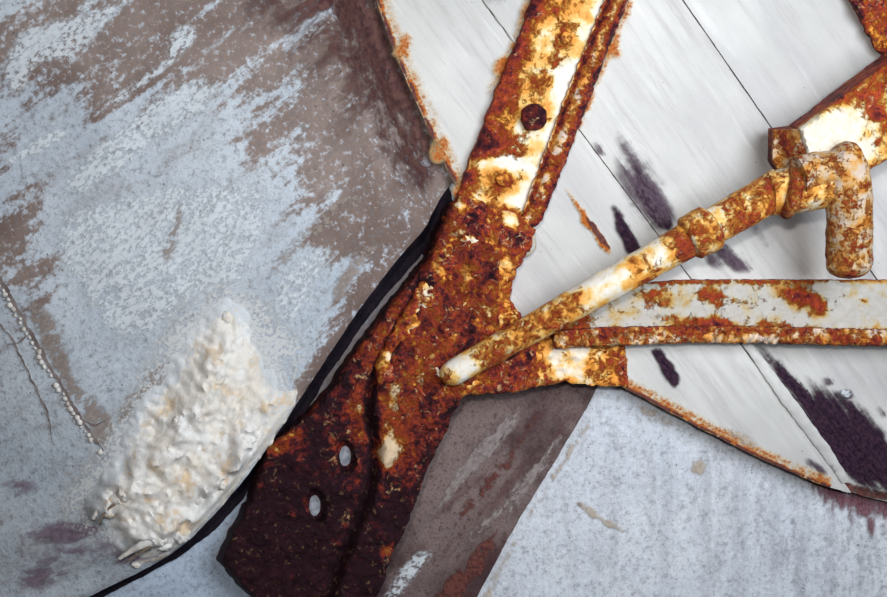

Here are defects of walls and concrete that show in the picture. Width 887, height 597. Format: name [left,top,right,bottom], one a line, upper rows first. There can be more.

rust [377,0,462,197]
rust [491,2,529,86]
rust [576,0,633,133]
rust [568,191,611,254]
crack [0,277,108,455]
leakage [22,284,305,588]
rust [460,416,536,519]
rust [623,380,887,536]
leakage [761,348,887,494]
rust [436,532,497,597]